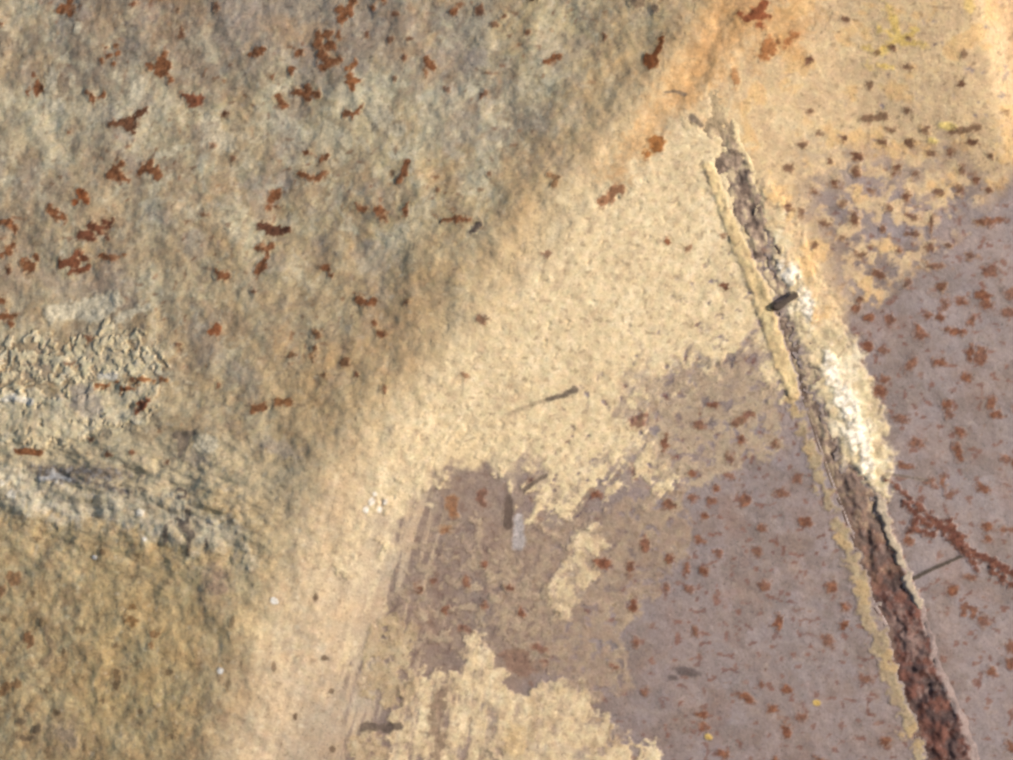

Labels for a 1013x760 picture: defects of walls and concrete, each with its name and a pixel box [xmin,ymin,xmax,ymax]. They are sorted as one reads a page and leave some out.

rust [143,5,207,110]
rust [267,0,402,112]
rust [105,102,151,142]
rust [104,156,165,185]
rust [294,148,333,185]
rust [43,186,129,278]
rust [248,186,295,296]
rust [91,374,171,418]
damp [782,284,926,609]
damp [501,492,529,552]
crack [881,476,1013,591]
damp [357,720,406,736]